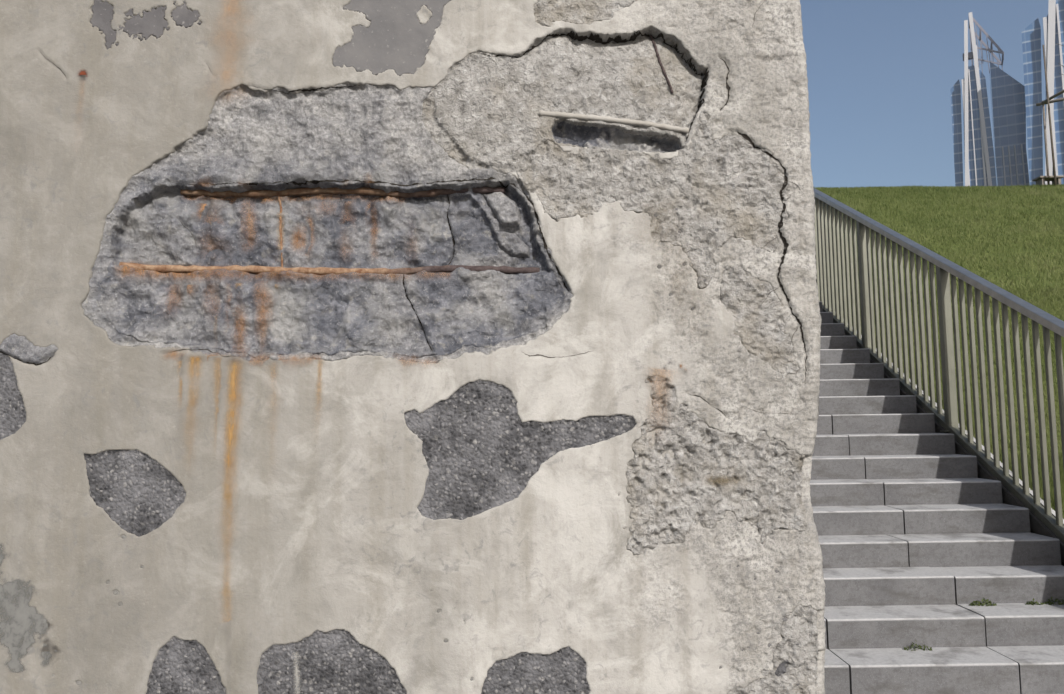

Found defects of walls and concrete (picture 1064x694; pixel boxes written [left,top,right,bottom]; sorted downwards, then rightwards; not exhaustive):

crack [686,58,730,141]
spalling [82,0,800,380]
crack [737,132,807,380]
flaking render [0,334,58,365]
rust [227,363,237,467]
flaking render [618,376,807,555]